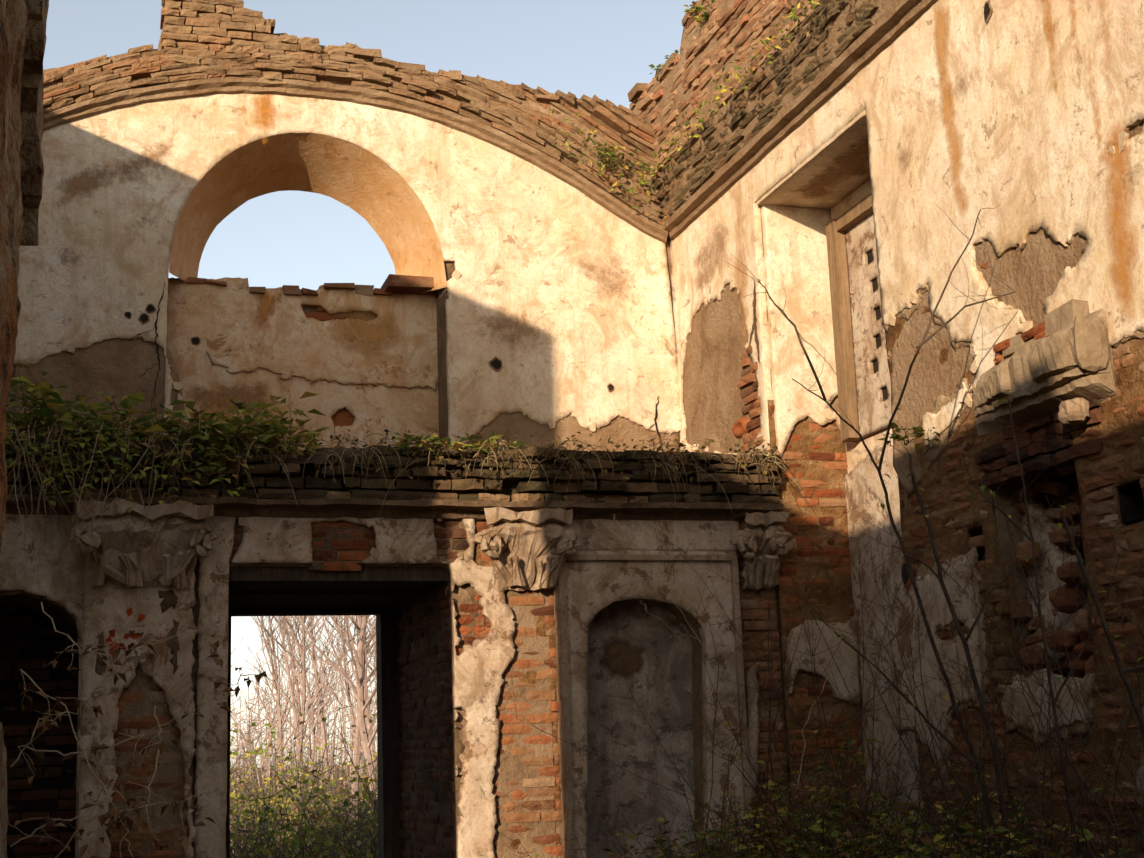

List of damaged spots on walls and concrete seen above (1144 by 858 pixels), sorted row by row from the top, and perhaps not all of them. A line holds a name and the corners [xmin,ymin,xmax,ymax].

flaking render [974,229,1087,335]
flaking render [14,332,185,445]
crack [128,283,165,407]
flaking render [331,408,355,427]
flaking render [94,632,108,675]
flaking render [158,589,180,674]
flaking render [308,520,381,572]
flaking render [455,583,491,656]
flaking render [471,280,869,858]
flaking render [882,284,1144,858]
flaking render [106,675,194,858]
flaking render [456,707,465,768]